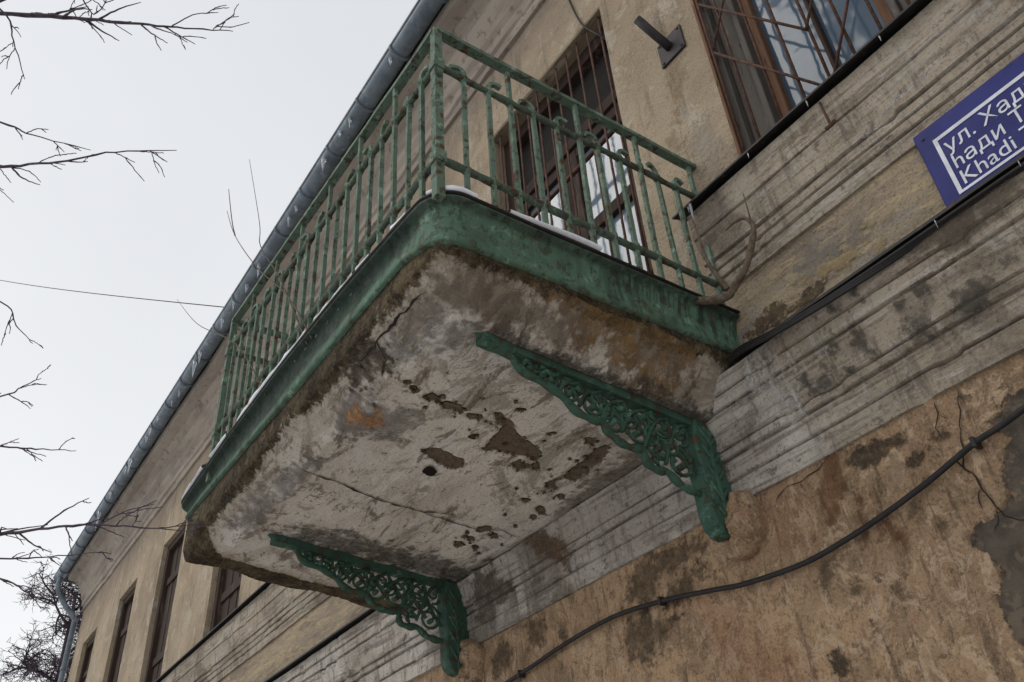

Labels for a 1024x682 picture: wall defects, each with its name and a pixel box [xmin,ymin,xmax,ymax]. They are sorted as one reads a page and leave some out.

crack [359,291,426,375]
crack [302,469,516,538]
spalling [338,332,611,521]
peeling [453,525,503,554]
crack [934,389,1024,532]
flaking render [971,388,1024,645]